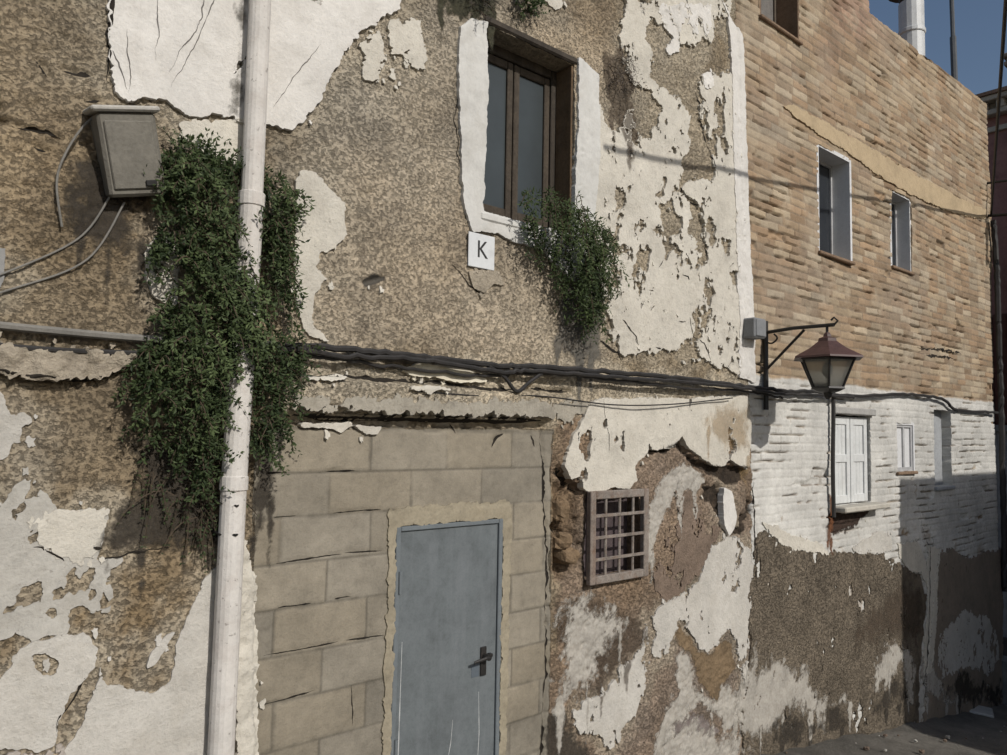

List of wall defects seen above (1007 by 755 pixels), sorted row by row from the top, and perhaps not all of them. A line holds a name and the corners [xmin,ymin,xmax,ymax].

crack [18,127,60,152]
crack [34,0,131,103]
peeling [106,0,249,166]
crack [155,0,214,80]
peeling [266,0,428,131]
peeling [589,0,756,383]
peeling [0,392,38,460]
peeling [0,467,216,755]
damp [102,436,223,569]
peeling [560,395,754,749]
peeling [762,522,829,555]
flaking render [826,511,869,535]